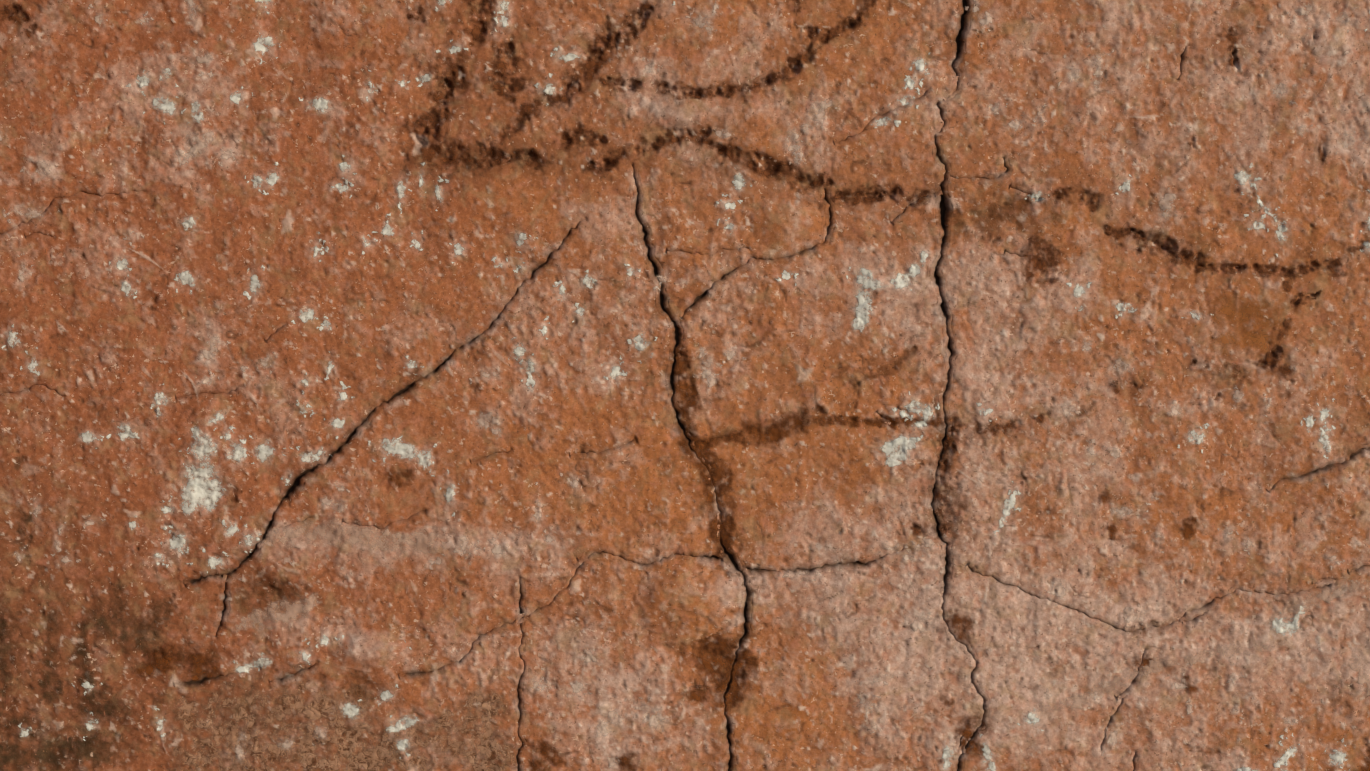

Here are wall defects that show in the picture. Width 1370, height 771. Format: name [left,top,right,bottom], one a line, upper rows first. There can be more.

crack [176,216,588,637]
crack [399,0,1370,771]
crack [174,660,318,689]